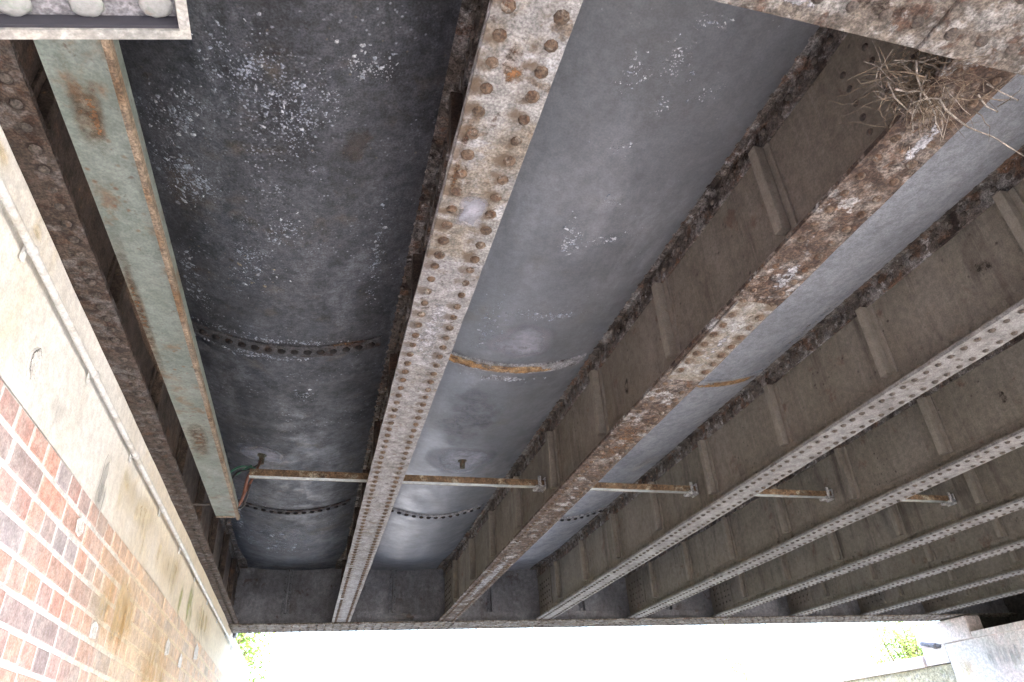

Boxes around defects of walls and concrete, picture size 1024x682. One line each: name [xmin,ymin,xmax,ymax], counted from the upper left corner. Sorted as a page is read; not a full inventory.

corrosion [71,93,105,139]
corrosion [449,354,550,373]
corrosion [696,376,754,388]